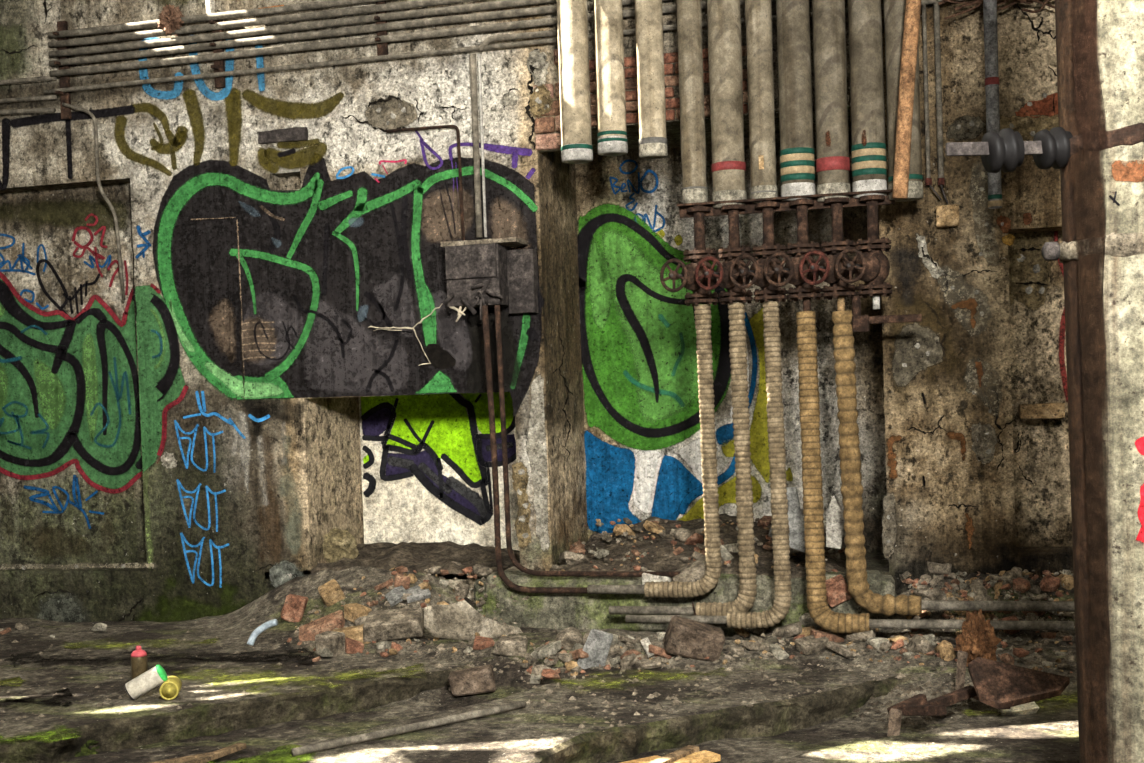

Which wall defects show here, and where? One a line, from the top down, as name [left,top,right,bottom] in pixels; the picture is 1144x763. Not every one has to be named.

crack [0,0,51,54]
flaking render [365,95,418,130]
flaking render [525,48,562,153]
flaking render [589,59,597,127]
flaking render [624,56,638,124]
flaking render [664,52,680,121]
flaking render [702,48,711,117]
leakage [895,545,1073,593]